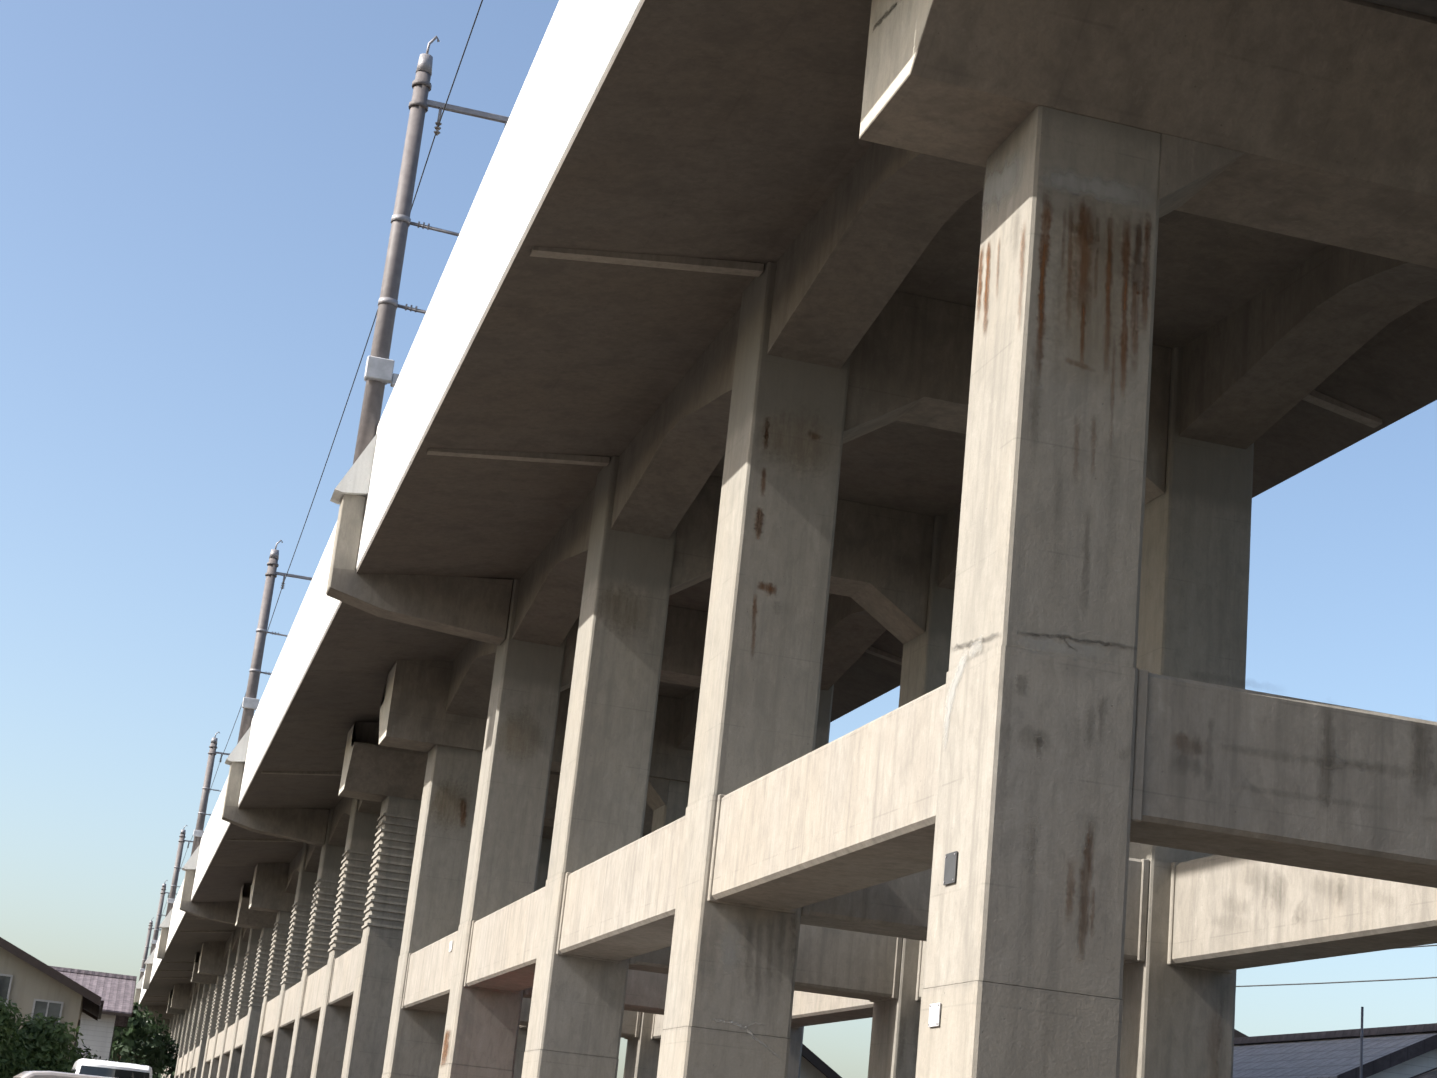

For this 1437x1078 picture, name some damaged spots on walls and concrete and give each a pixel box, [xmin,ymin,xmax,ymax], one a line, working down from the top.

corrosion [978,243,990,319]
corrosion [1038,208,1051,349]
corrosion [1079,207,1149,375]
corrosion [755,510,763,535]
corrosion [753,583,774,638]
crack [1030,634,1110,646]